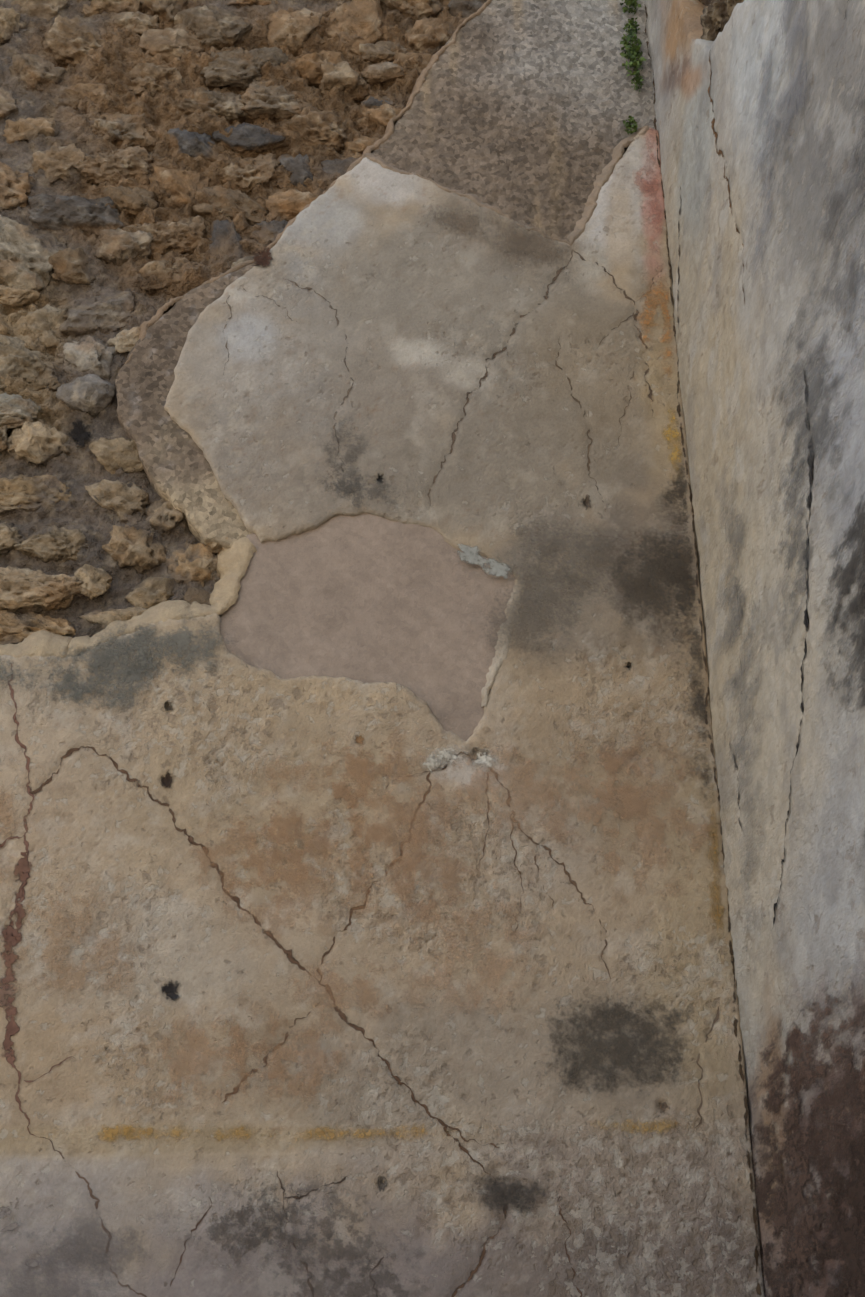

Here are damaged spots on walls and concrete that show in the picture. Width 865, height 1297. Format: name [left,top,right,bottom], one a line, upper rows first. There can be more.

spalling [372,0,657,240]
peeling [115,263,264,549]
crack [223,269,355,493]
crack [428,4,745,860]
spalling [422,747,495,771]
spalling [458,544,510,578]
damp [493,466,694,648]
damp [689,629,706,720]
crack [773,370,814,926]
damp [830,496,865,710]
crack [0,664,611,1297]
crack [695,905,762,1295]